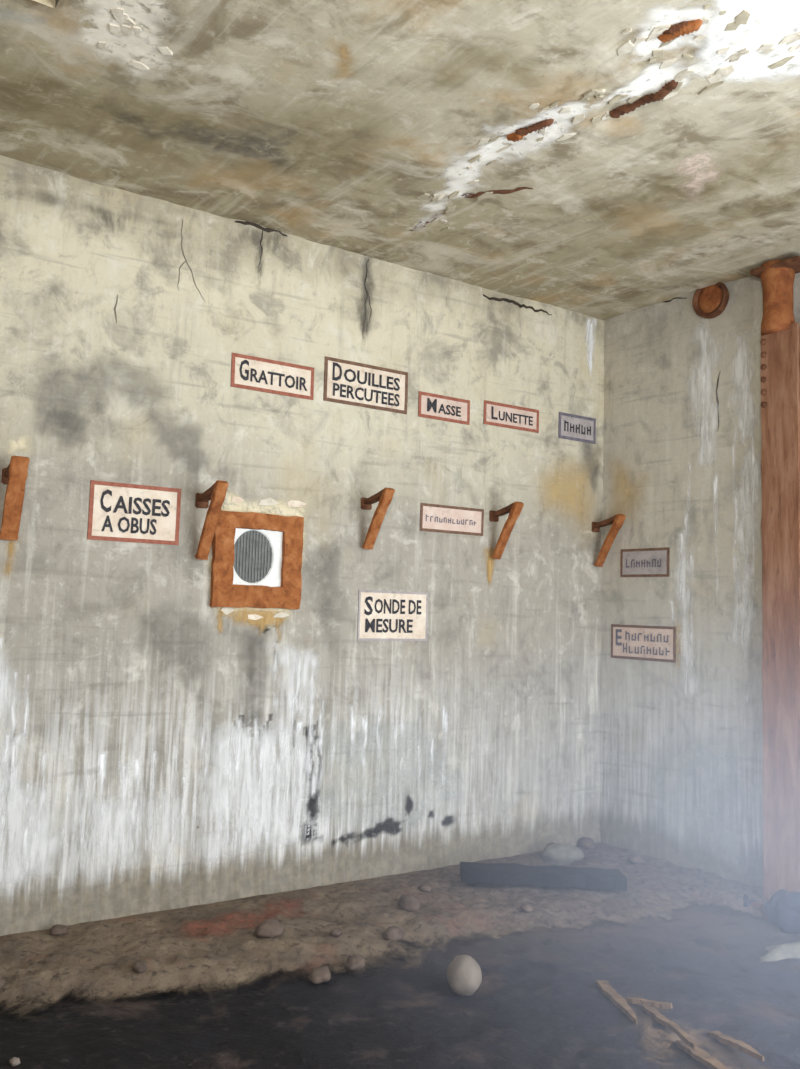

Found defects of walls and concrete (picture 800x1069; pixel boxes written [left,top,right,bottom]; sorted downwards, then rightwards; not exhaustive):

spalling [416,4,800,232]
crack [483,294,552,315]
water stain [689,328,717,470]
water stain [732,337,760,659]
rust [218,611,283,631]
water stain [670,515,697,697]
water stain [0,638,64,882]
water stain [66,649,334,877]
water stain [351,707,382,765]
water stain [332,797,413,844]